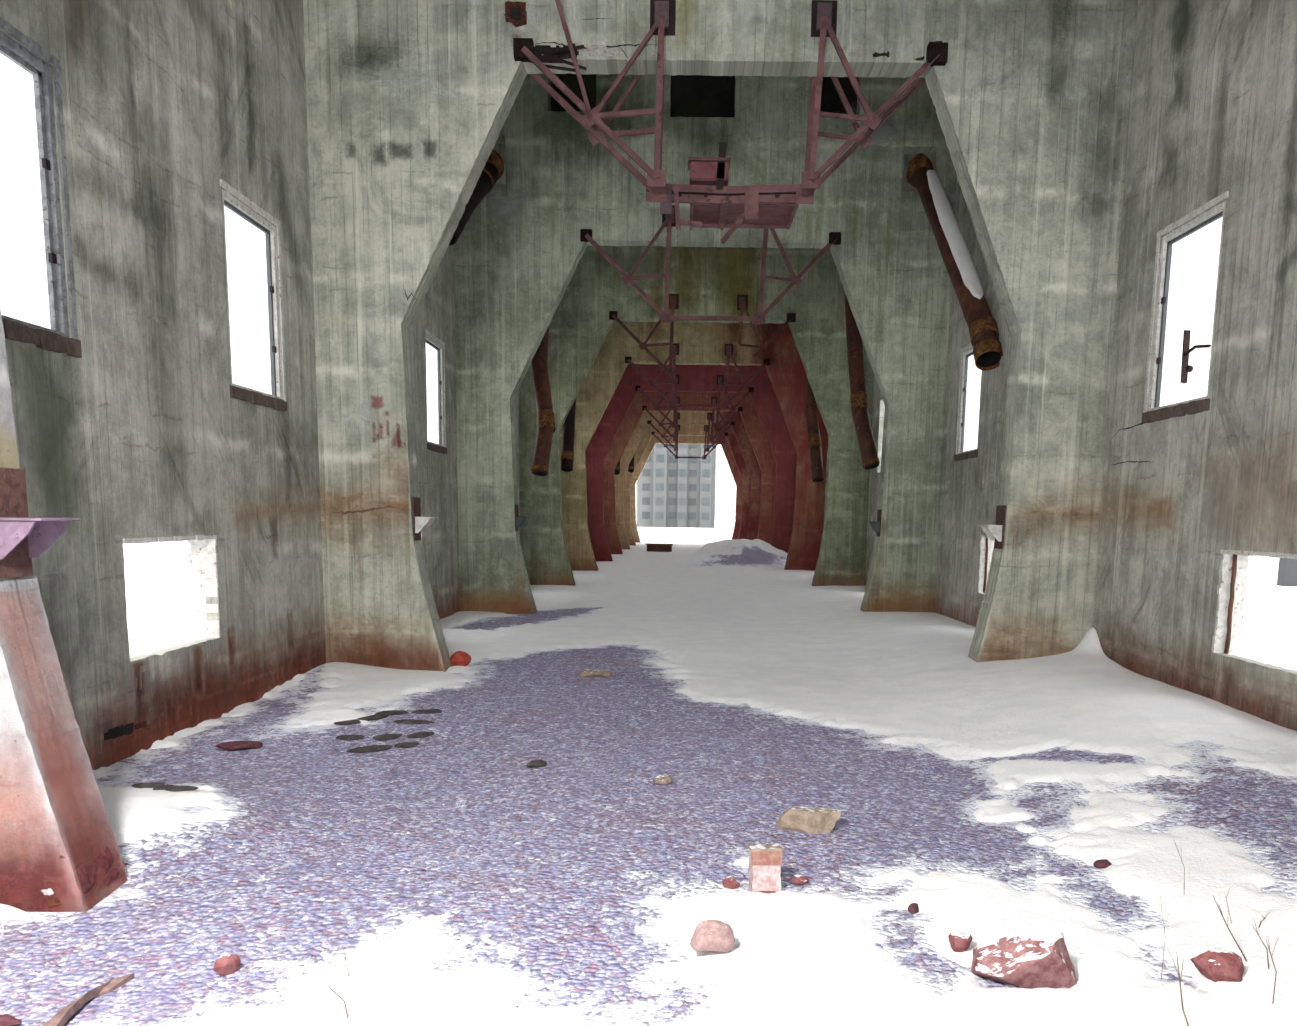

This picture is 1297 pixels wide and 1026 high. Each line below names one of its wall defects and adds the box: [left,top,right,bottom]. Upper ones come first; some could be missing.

rust [103,649,314,766]